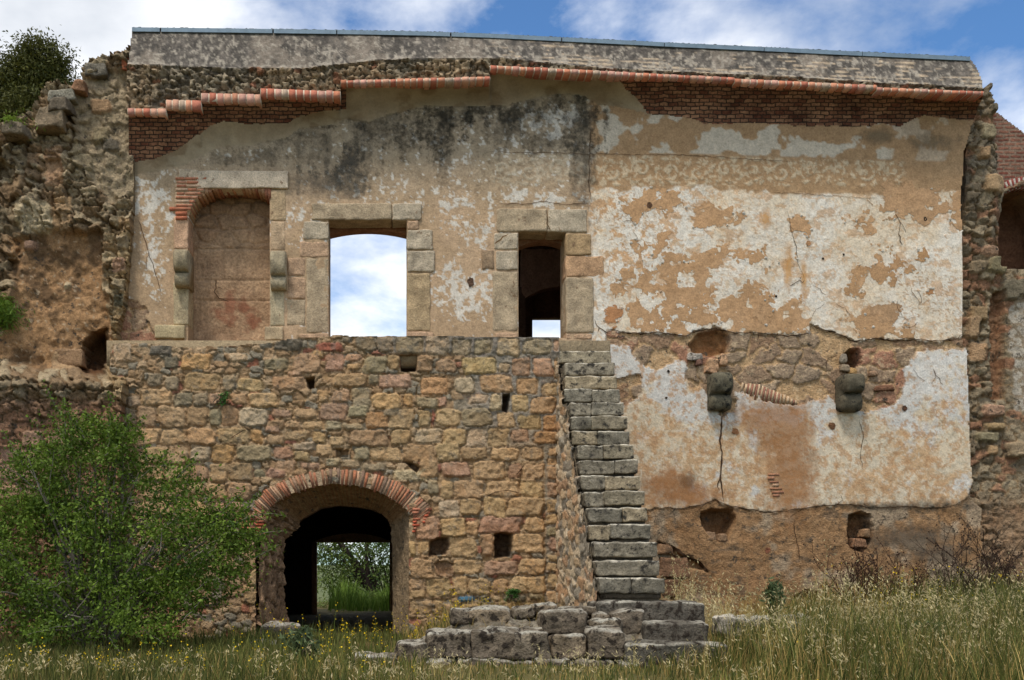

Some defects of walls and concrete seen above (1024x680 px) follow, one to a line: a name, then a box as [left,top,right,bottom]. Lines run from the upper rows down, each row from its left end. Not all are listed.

water stain [297,121,387,193]
spalling [603,179,966,418]
flaking render [768,473,784,497]
crack [661,419,967,559]